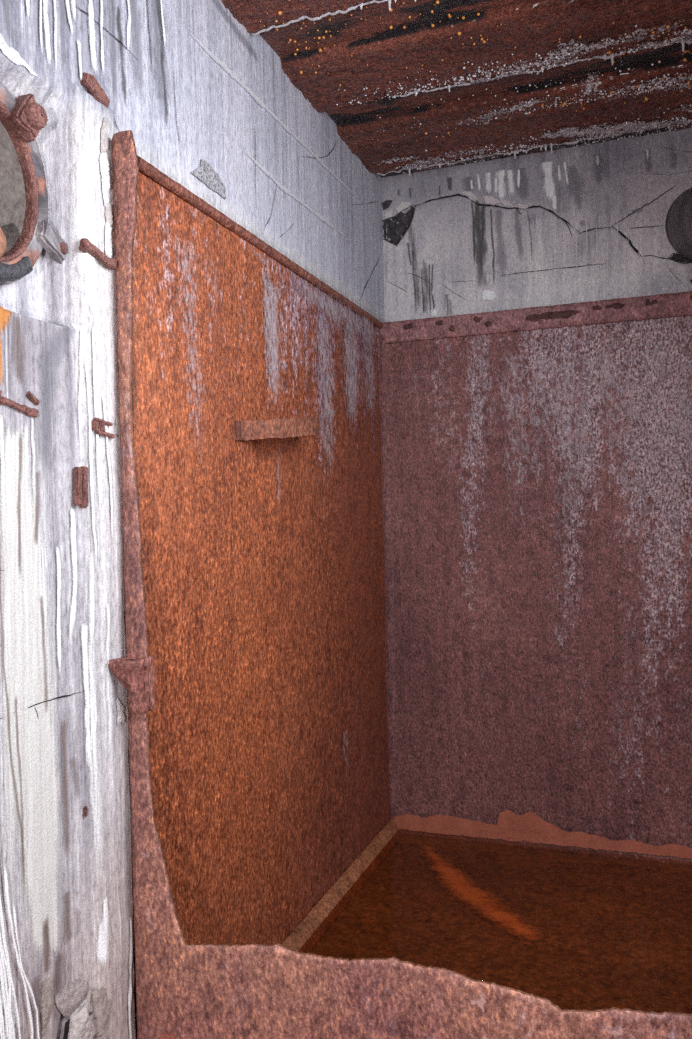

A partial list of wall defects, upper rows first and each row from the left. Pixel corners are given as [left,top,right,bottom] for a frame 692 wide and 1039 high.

damp [239,0,396,52]
damp [392,21,692,101]
damp [456,99,568,125]
spalling [382,200,416,246]
crack [355,146,687,283]
damp [375,104,692,301]
damp [407,215,452,317]
corrosion [0,306,11,383]
corrosion [395,810,692,859]
spalling [41,978,112,1039]
peeling [471,993,486,1012]